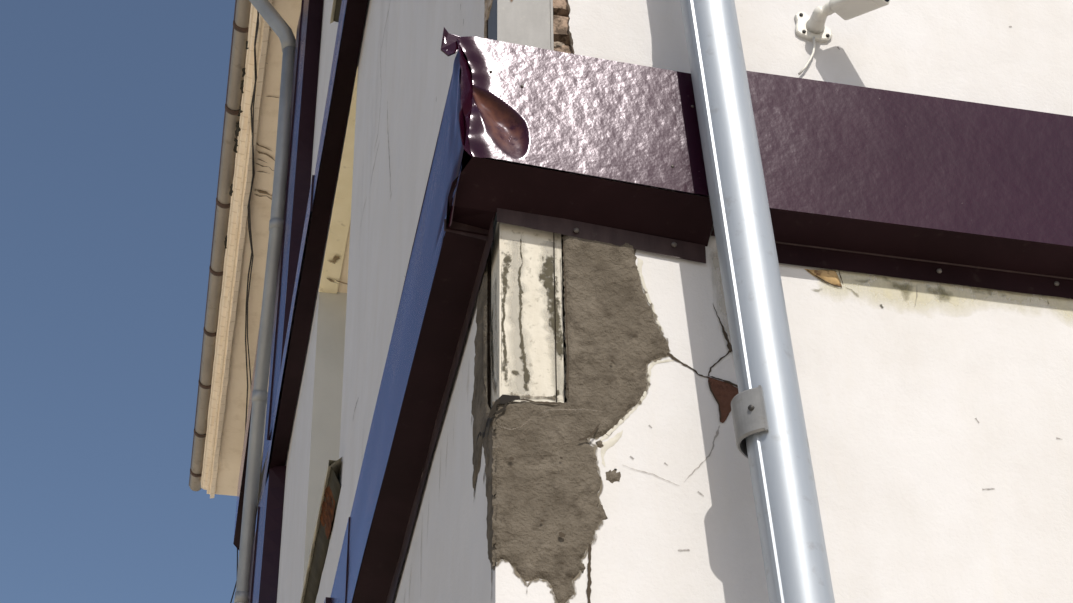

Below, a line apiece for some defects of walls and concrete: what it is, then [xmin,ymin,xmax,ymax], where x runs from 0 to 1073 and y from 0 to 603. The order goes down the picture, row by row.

spalling [484,0,493,39]
spalling [550,0,575,54]
spalling [553,233,567,403]
peeling [637,258,664,331]
crack [667,305,733,378]
water stain [876,275,987,308]
peeling [600,359,673,466]
spalling [708,376,739,423]
crack [631,431,718,483]